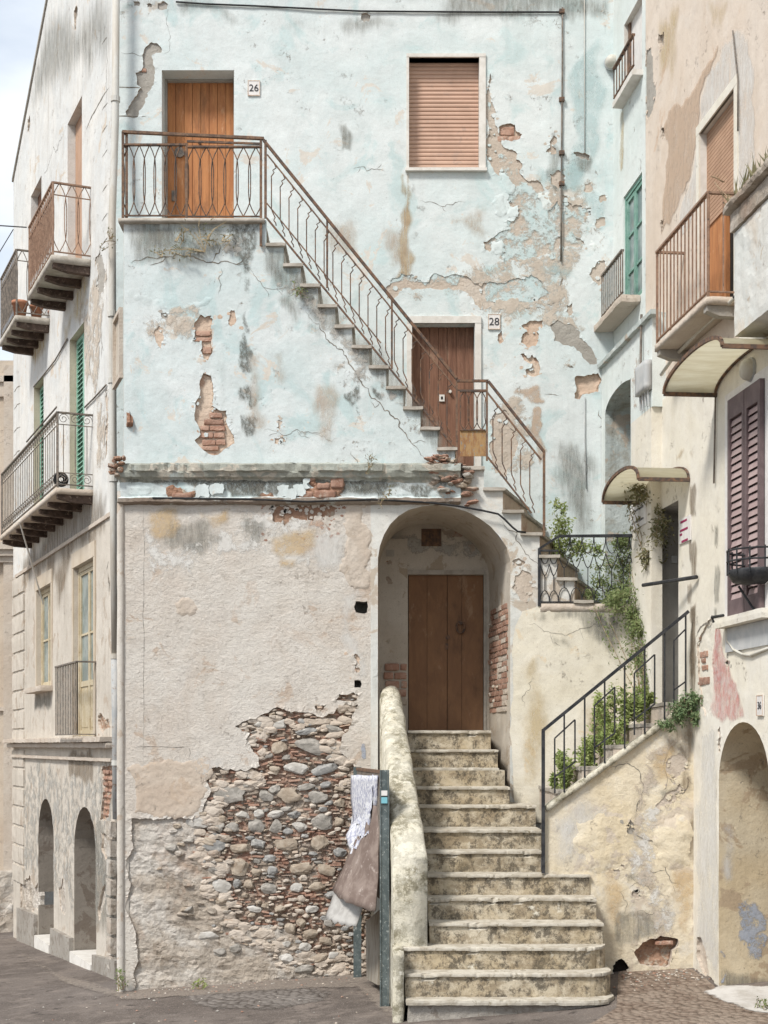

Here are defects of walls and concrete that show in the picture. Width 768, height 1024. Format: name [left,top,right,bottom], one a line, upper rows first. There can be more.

spalling [126,43,162,118]
peeling [646,48,656,117]
water stain [230,224,256,269]
peeling [386,75,607,378]
flaking render [146,305,244,455]
water stain [240,336,252,372]
water stain [240,387,257,435]
crack [306,312,424,455]
spalling [565,360,601,399]
peeling [144,478,346,576]
crack [613,748,691,842]
peeling [609,739,690,972]